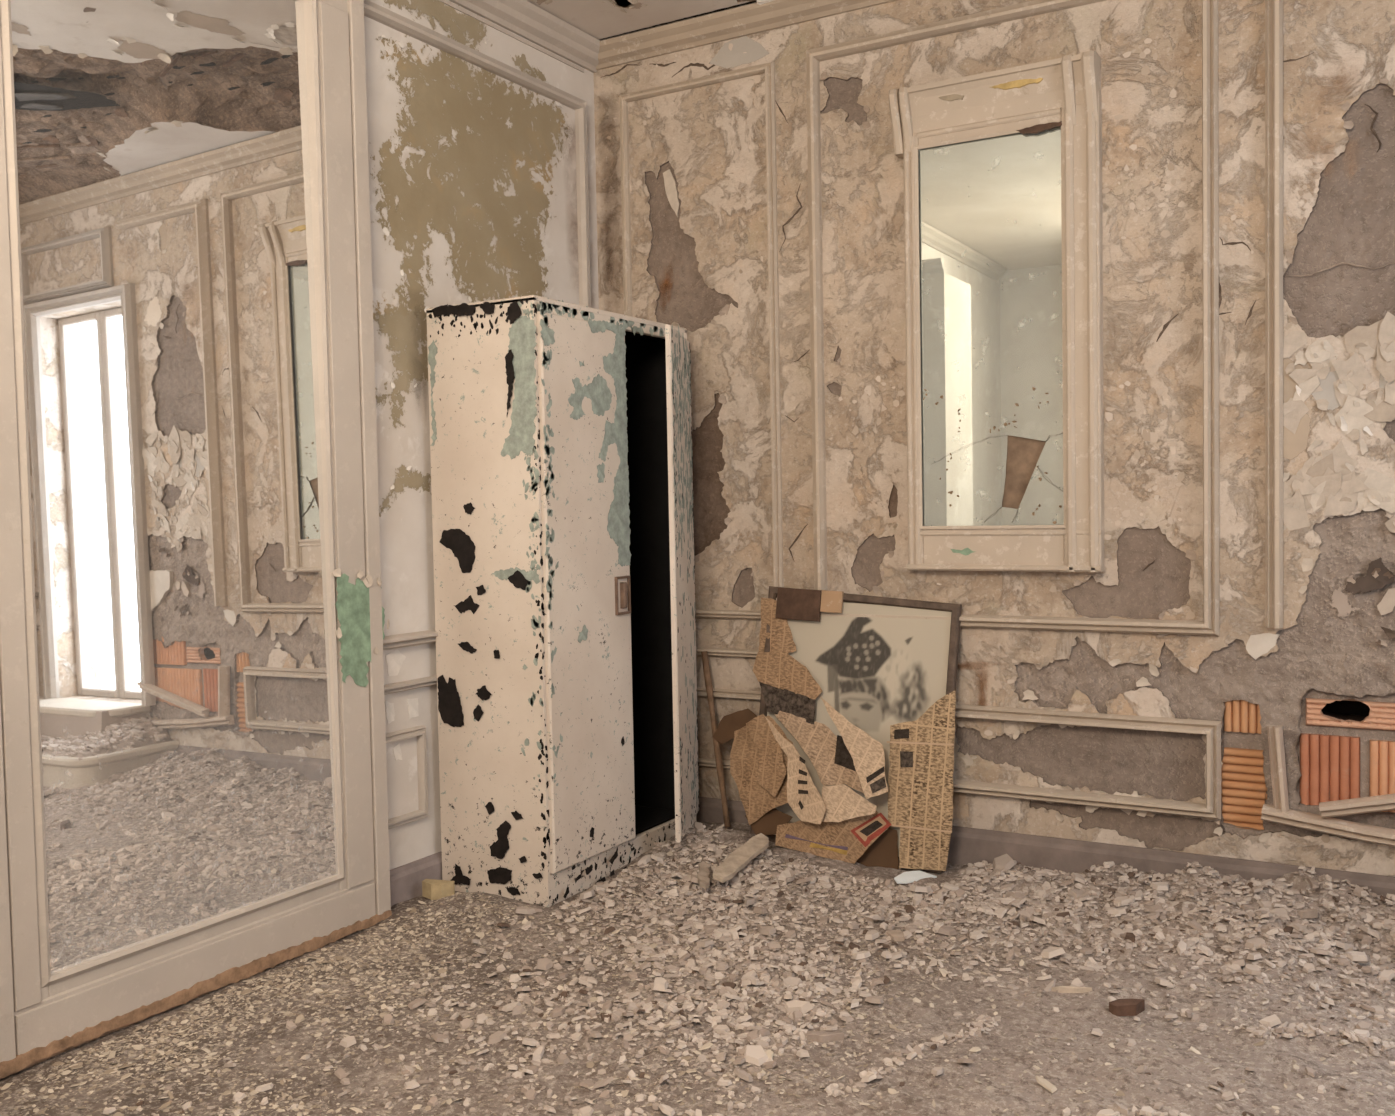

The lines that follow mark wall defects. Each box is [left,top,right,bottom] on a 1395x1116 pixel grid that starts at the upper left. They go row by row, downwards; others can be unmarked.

flaking render [820,72,870,128]
peeling [1123,38,1158,76]
peeling [369,0,568,429]
flaking render [633,161,767,344]
flaking render [692,373,763,562]
peeling [825,346,905,435]
flaking render [955,78,1395,851]
peeling [332,568,406,687]